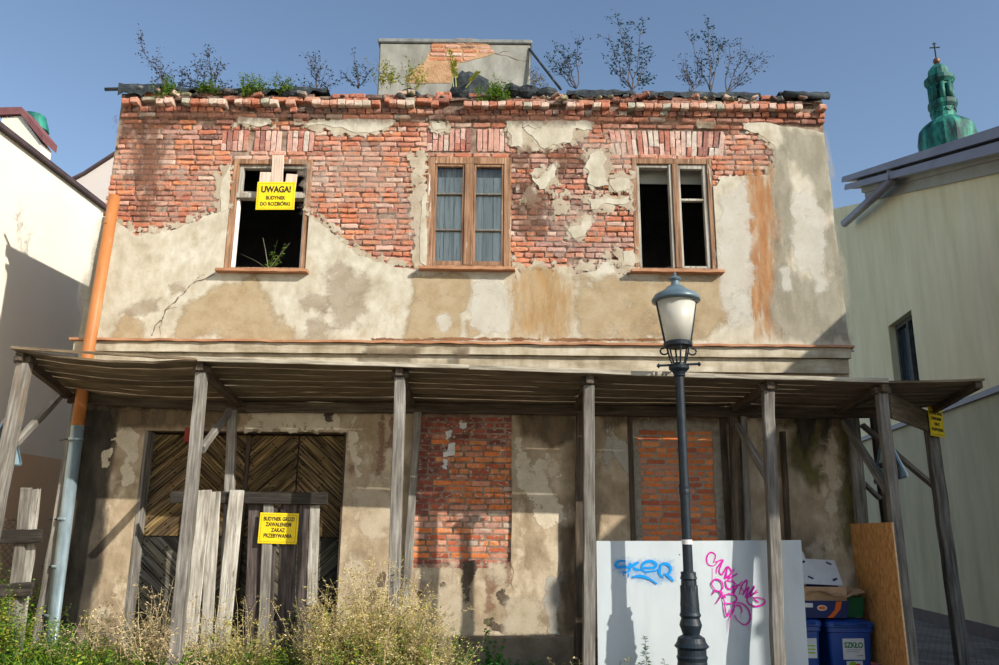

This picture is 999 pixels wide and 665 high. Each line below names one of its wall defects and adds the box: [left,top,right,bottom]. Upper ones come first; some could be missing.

flaking render [409,38,495,83]
flaking render [100,112,777,334]
rust [745,165,780,332]
crack [151,274,214,336]
damp [204,411,238,428]
peeling [101,427,140,487]
damp [59,405,192,632]
damp [485,562,512,613]